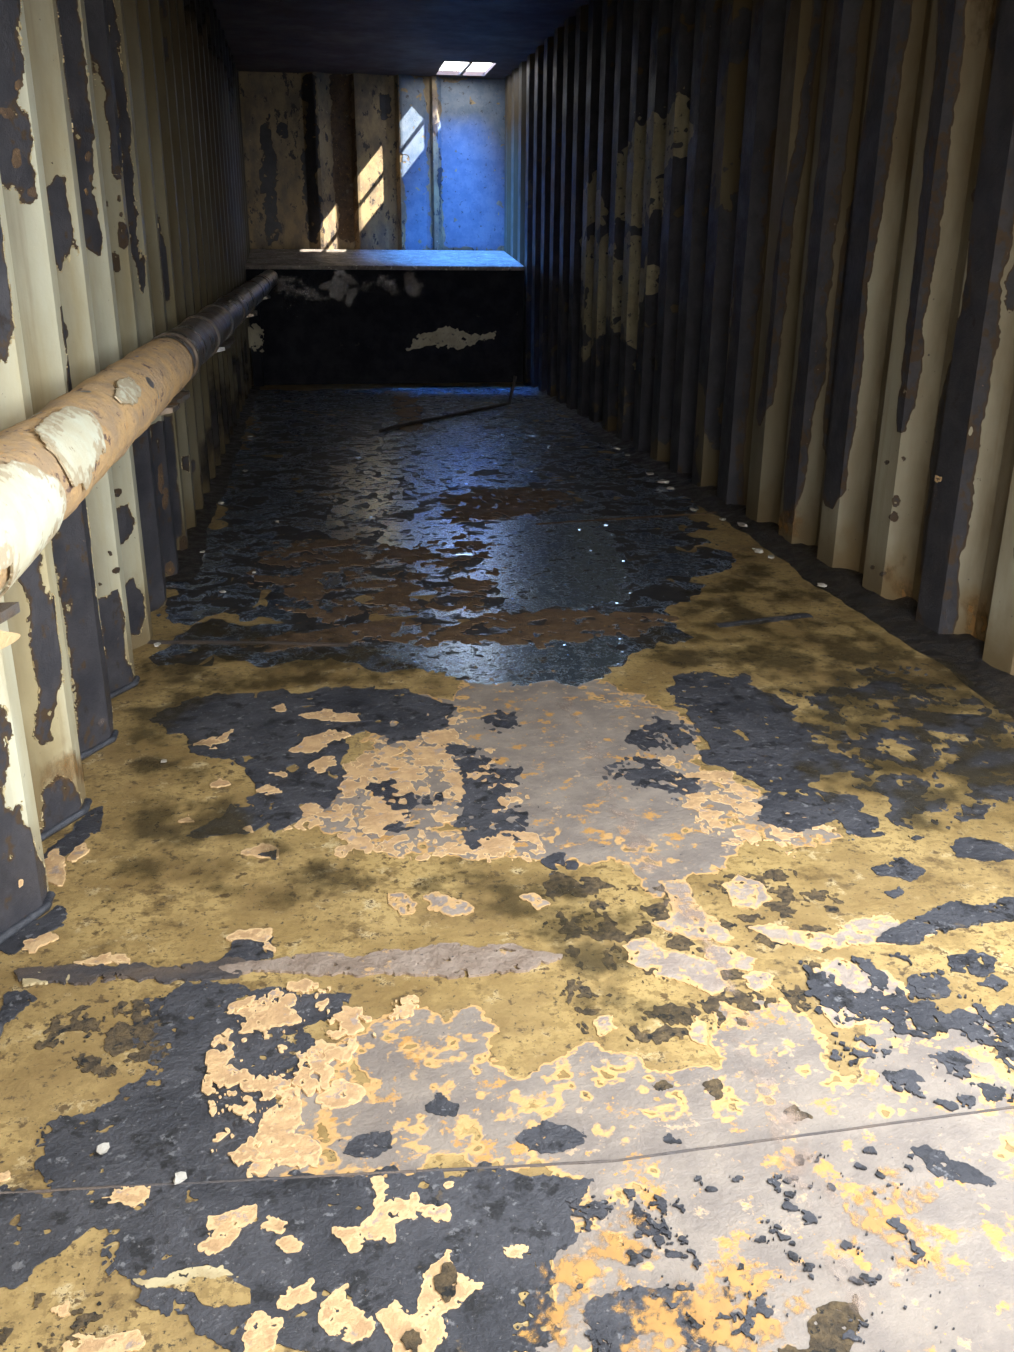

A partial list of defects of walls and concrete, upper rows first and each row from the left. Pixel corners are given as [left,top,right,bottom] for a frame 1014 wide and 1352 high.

damp [201,340,250,482]
peeling [0,0,758,838]
peeling [757,0,913,524]
peeling [896,0,967,433]
peeling [915,0,1014,634]
peeling [0,704,104,955]
peeling [218,928,276,961]
peeling [666,671,1014,841]
peeling [871,857,926,899]
peeling [905,949,1014,1070]
peeling [950,837,1014,862]
peeling [0,972,594,1352]